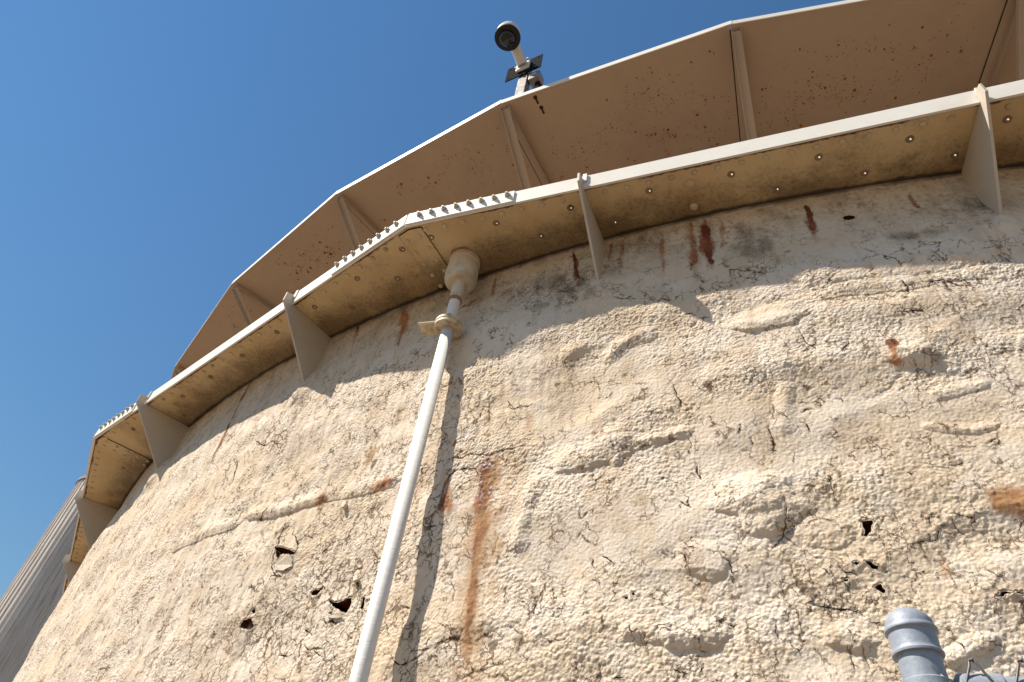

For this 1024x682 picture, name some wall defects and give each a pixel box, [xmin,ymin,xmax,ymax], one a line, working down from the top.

corrosion [804,205,816,233]
corrosion [690,220,724,265]
corrosion [885,339,902,365]
crack [738,407,832,452]
crack [774,474,867,548]
corrosion [990,489,1024,516]
crack [915,512,965,552]
peeling [274,555,293,571]
corrosion [465,457,498,648]